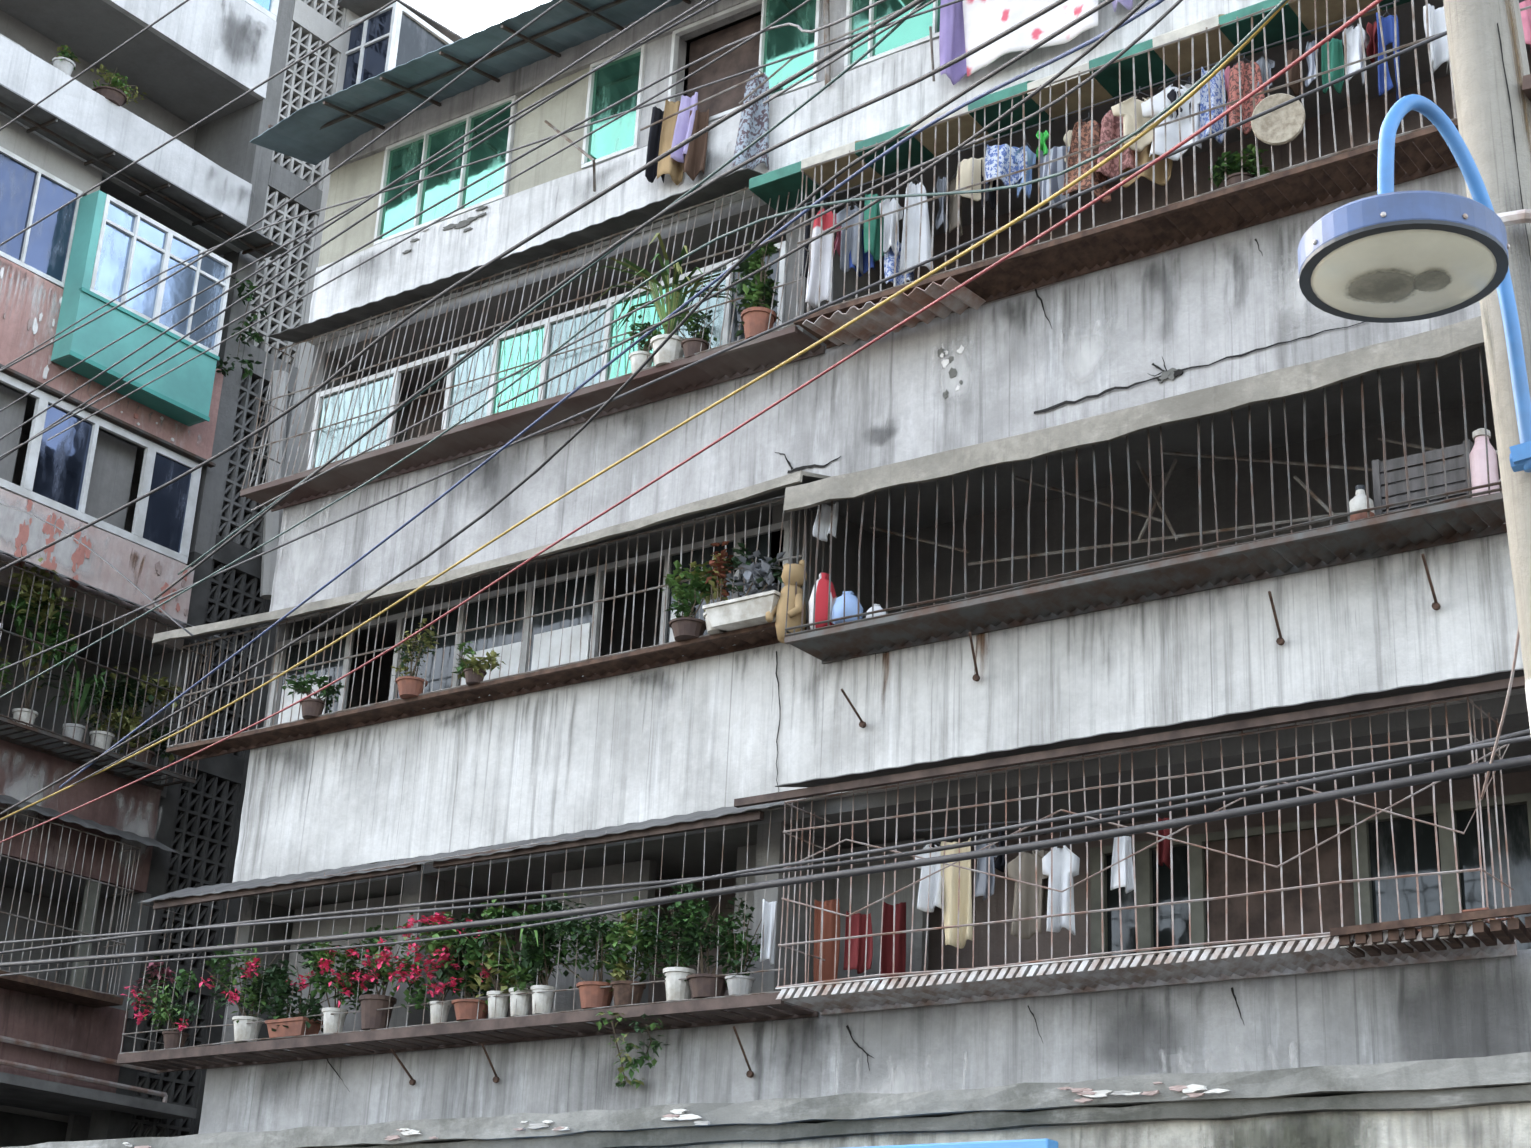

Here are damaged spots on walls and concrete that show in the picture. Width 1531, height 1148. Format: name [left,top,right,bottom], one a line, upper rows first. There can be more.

water stain [228,24,250,55]
water stain [1281,267,1306,310]
peeling [27,297,62,379]
spalling [937,345,965,399]
peeling [14,499,92,592]
water stain [1405,975,1523,1061]
water stain [868,1069,927,1094]
spalling [1057,1082,1231,1103]